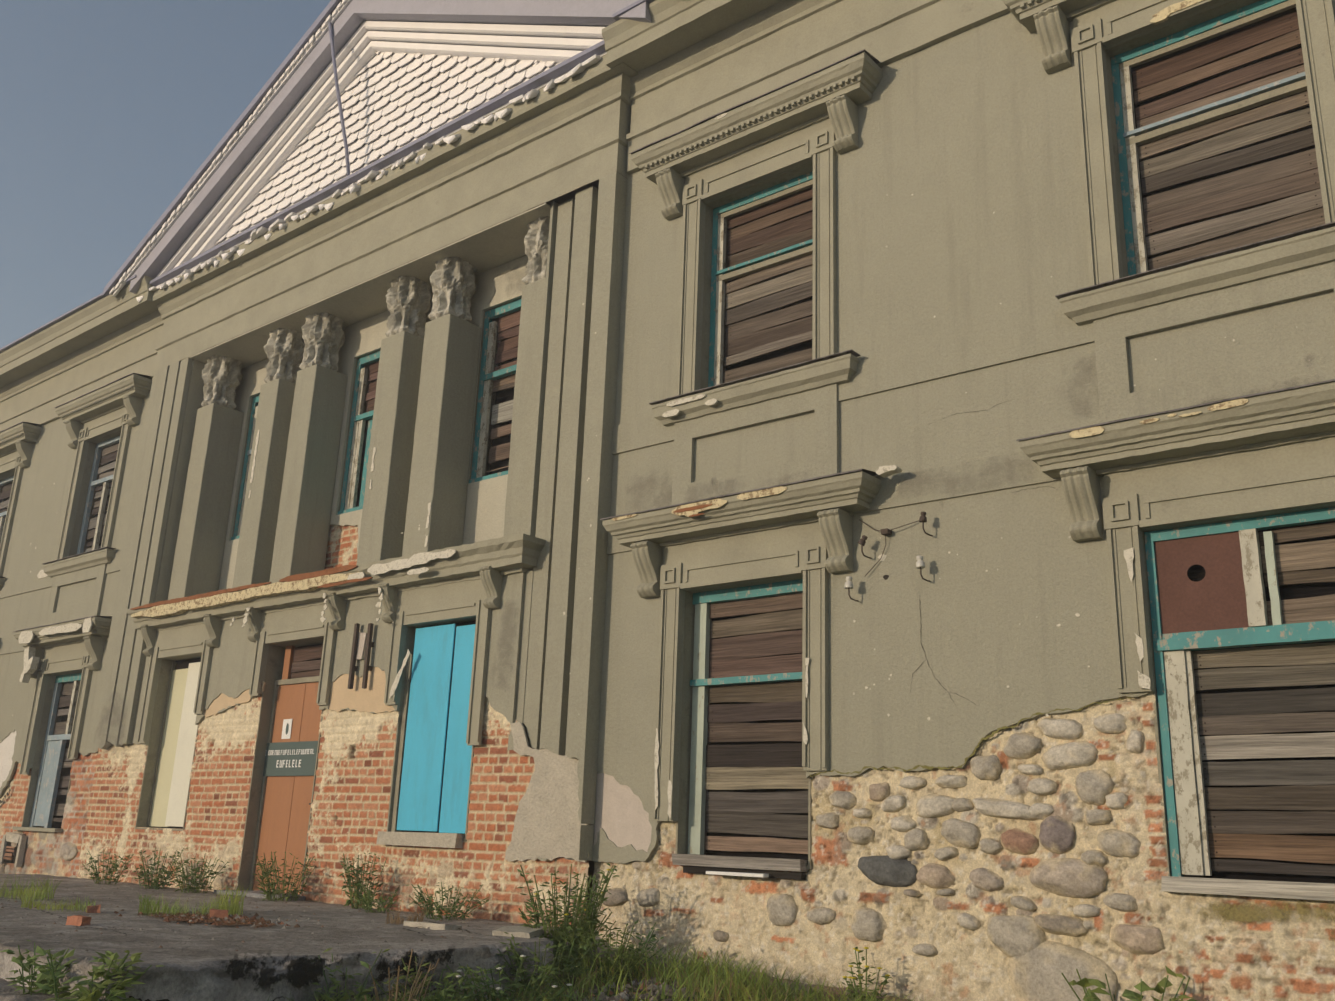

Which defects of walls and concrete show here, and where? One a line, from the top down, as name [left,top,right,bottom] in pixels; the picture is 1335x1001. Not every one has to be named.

spalling [1150,0,1204,25]
flaking render [1139,398,1249,424]
flaking render [1069,426,1105,439]
flaking render [672,486,787,517]
spalling [131,502,456,628]
peeling [1124,547,1134,583]
crack [910,610,976,705]
spalling [0,681,266,892]
spalling [302,633,1335,1001]